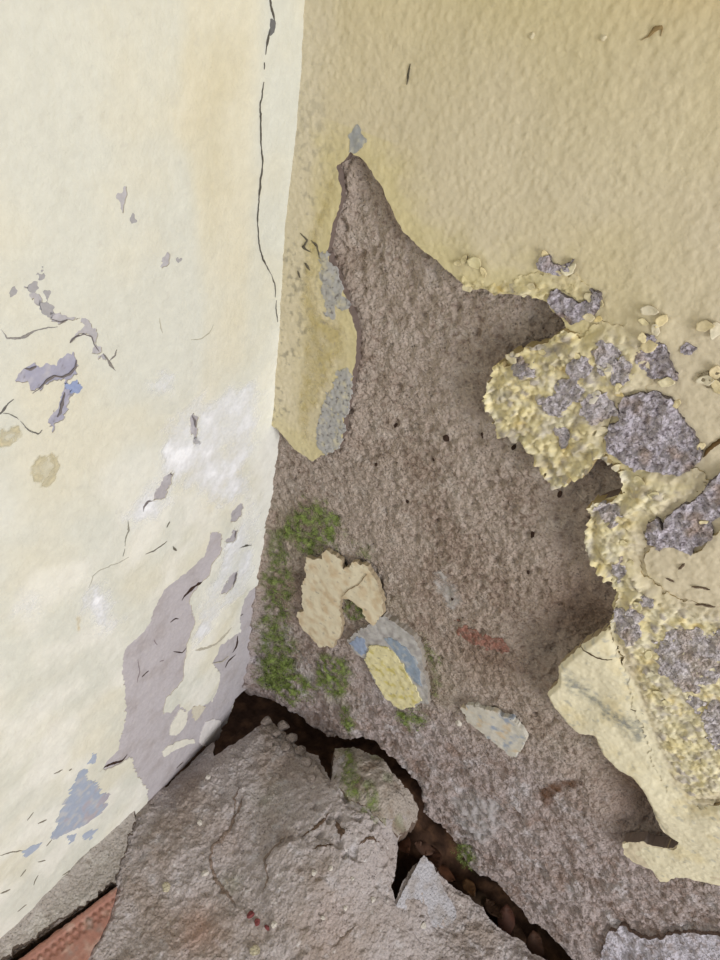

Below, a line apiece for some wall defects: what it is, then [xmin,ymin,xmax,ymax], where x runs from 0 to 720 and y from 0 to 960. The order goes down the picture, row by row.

crack [257,0,278,322]
spalling [9,266,106,432]
spalling [103,124,720,960]
crack [165,691,573,960]